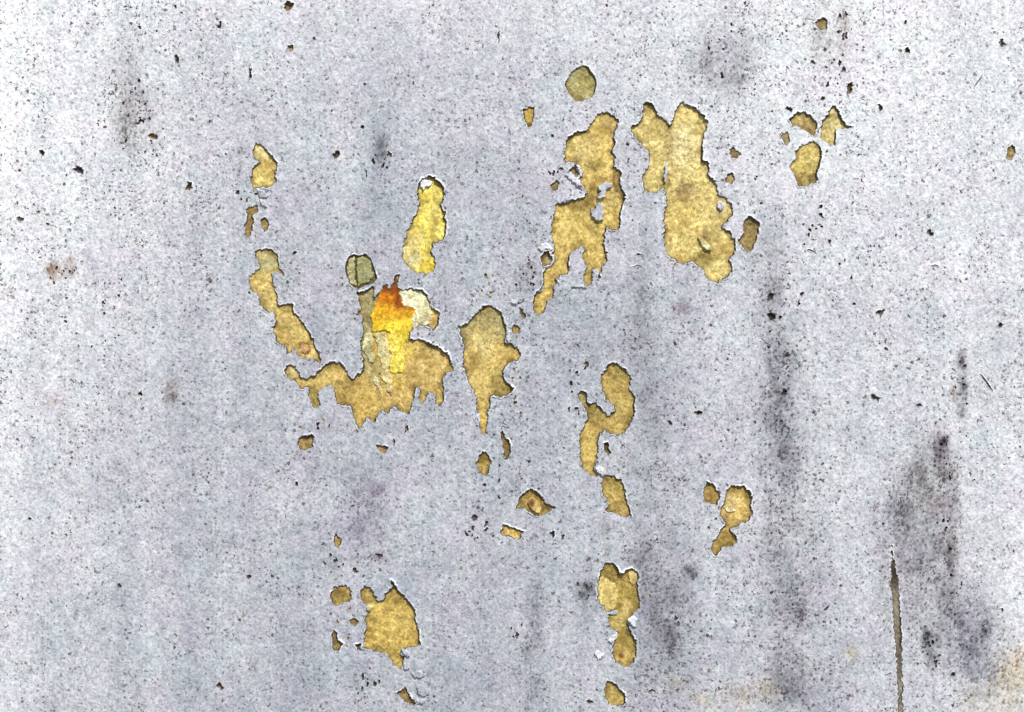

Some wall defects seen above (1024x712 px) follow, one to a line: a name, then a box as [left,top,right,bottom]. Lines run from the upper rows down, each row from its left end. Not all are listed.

peeling [563,64,598,103]
peeling [777,48,855,189]
peeling [235,142,279,238]
peeling [248,100,762,520]
peeling [321,533,430,707]
peeling [577,561,651,669]
peeling [702,480,755,558]
crack [889,543,905,712]
leakage [871,425,1005,680]